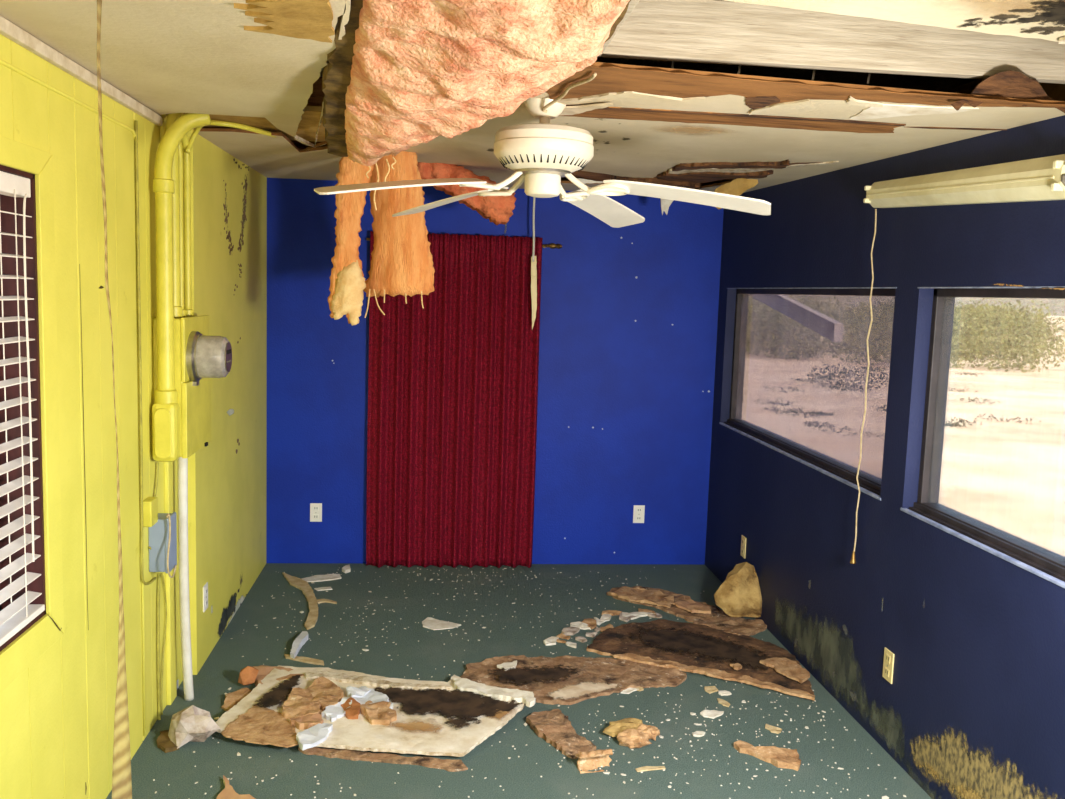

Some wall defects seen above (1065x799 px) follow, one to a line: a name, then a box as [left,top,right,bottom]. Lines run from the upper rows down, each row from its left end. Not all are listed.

water stain [960,0,1065,35]
peeling [546,66,1065,133]
water stain [775,601,1057,799]